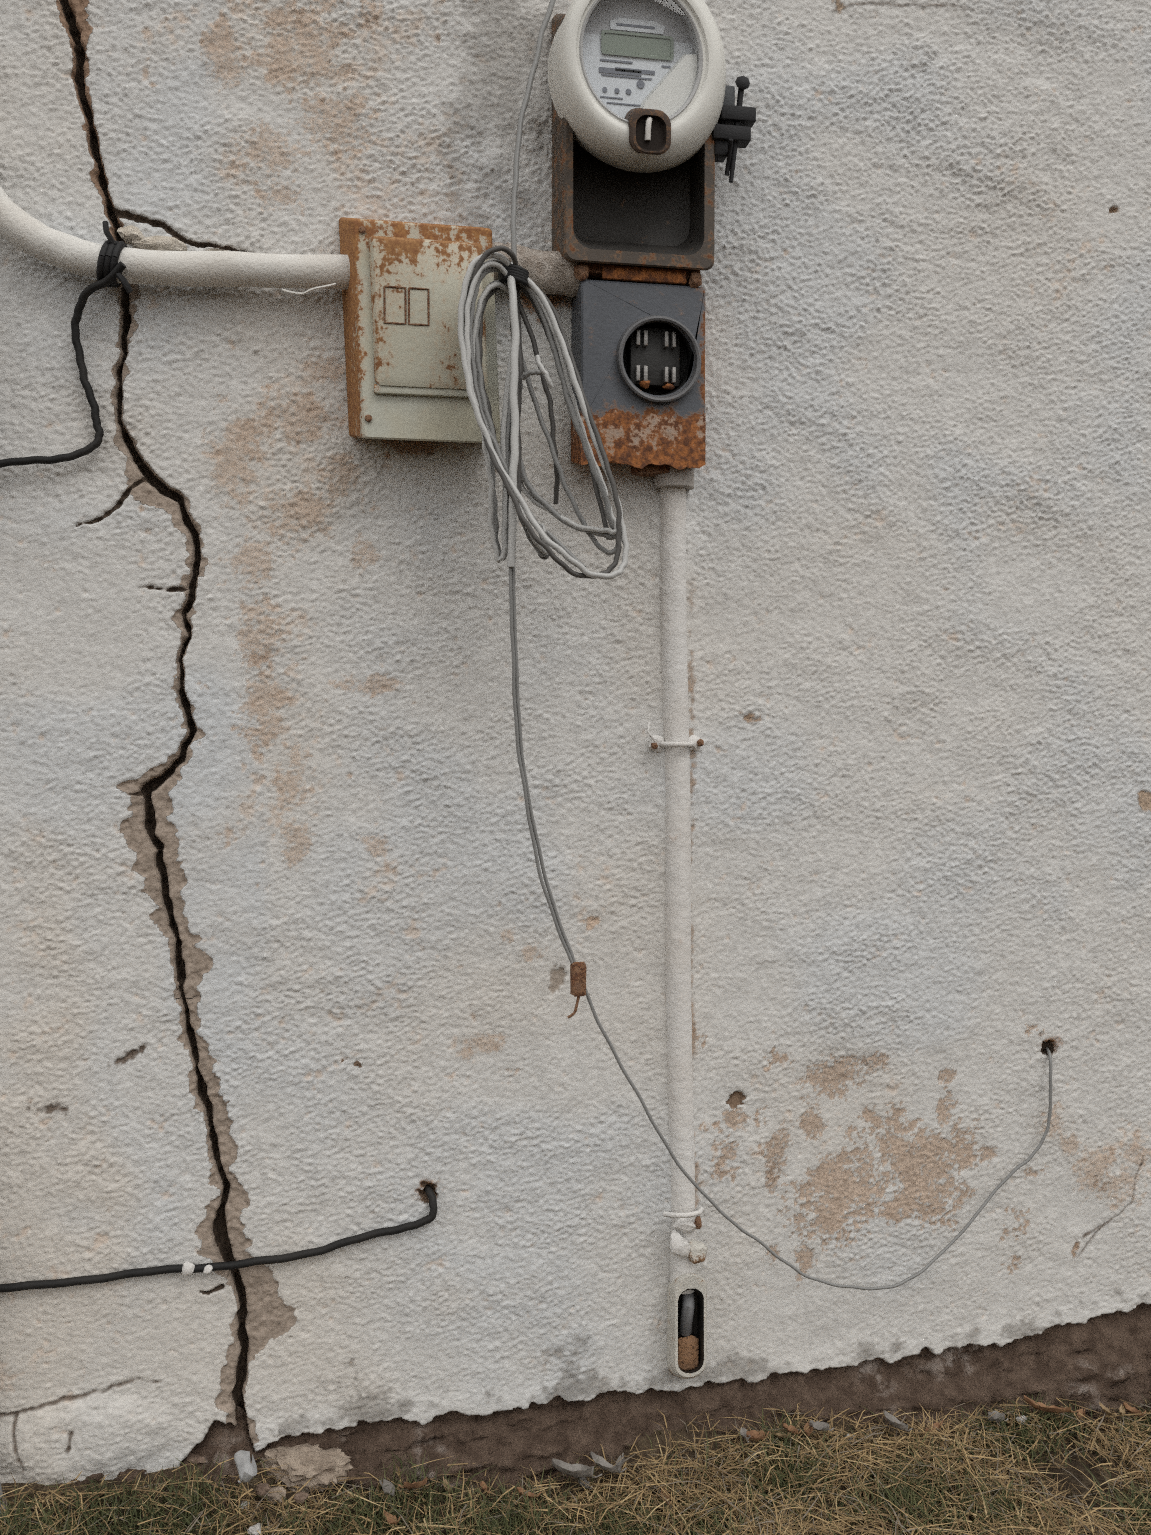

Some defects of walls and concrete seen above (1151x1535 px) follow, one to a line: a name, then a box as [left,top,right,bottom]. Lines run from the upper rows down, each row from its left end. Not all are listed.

crack [56,0,245,252]
corrosion [571,409,706,470]
crack [77,284,297,1448]
peeling [699,1047,996,1281]
peeling [999,1207,1030,1274]
crack [0,1380,158,1464]
flaking render [255,1483,309,1504]